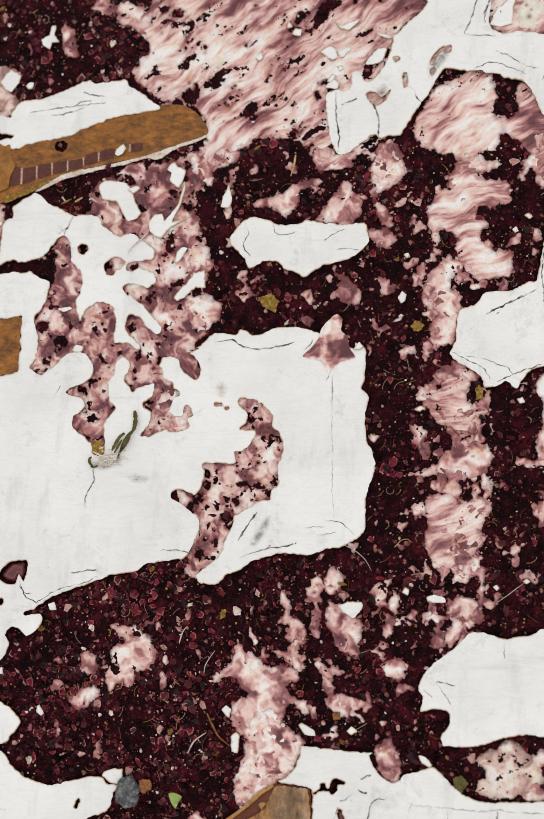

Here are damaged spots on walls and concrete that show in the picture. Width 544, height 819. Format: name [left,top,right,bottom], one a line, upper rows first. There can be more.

peeling [0,0,427,170]
peeling [221,185,232,208]
peeling [0,141,214,446]
peeling [171,398,283,579]
peeling [338,601,363,618]
peeling [427,595,445,603]
peeling [248,711,260,736]
peeling [260,707,281,742]
peeling [299,723,315,736]
peeling [231,732,240,753]
peeling [102,768,123,784]
peeling [234,767,272,798]